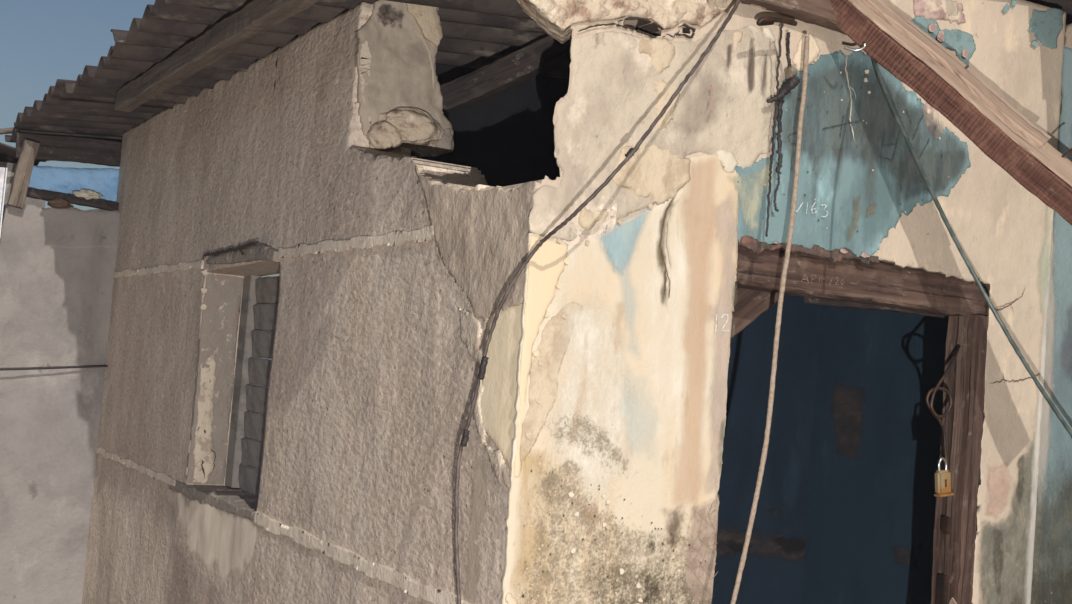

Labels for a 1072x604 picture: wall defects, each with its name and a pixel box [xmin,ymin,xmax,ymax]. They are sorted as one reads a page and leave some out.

peeling [911,0,976,68]
spalling [922,103,939,130]
spalling [410,25,880,604]
spalling [193,351,216,484]
damp [559,419,628,468]
damp [981,207,1072,604]
peeling [166,492,258,585]
damp [520,461,712,604]